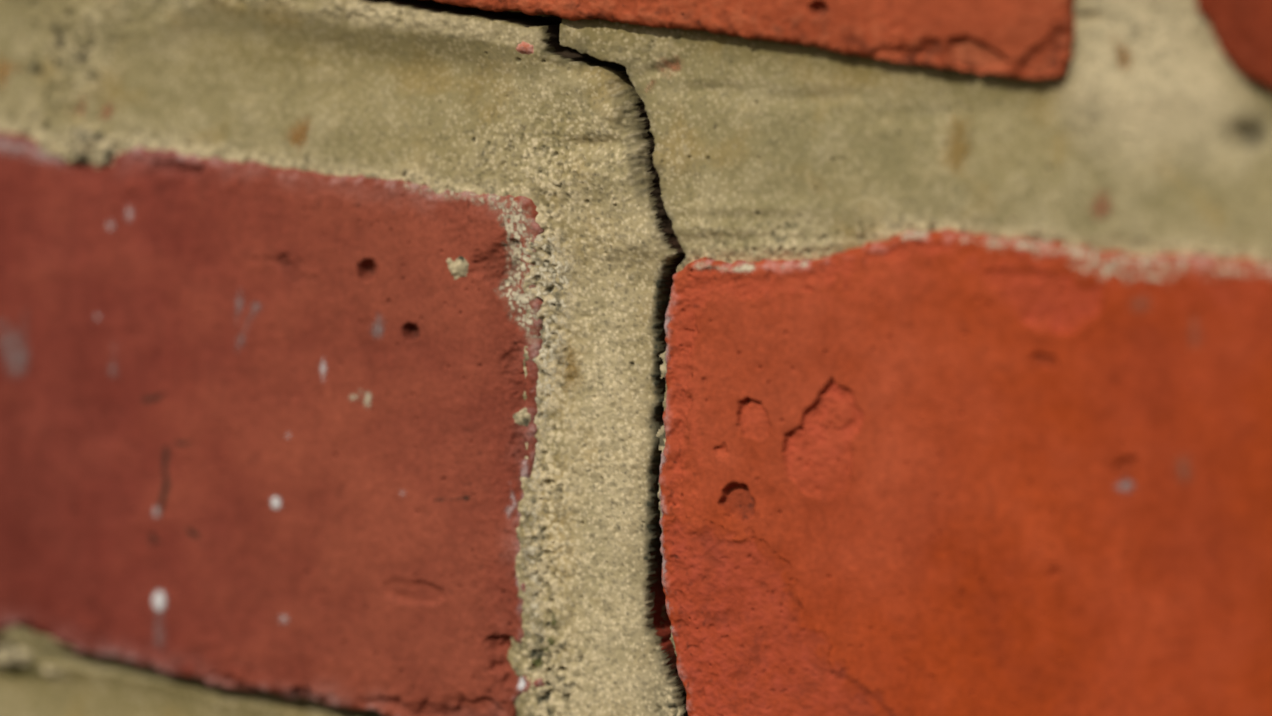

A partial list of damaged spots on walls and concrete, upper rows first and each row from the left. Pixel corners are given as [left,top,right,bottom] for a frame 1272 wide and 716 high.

crack [364,0,688,716]
spalling [661,237,974,716]
spalling [977,265,1107,339]